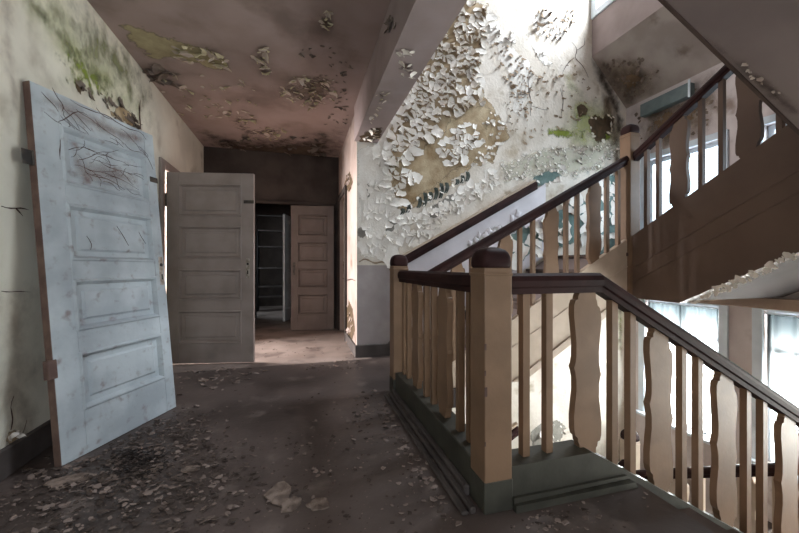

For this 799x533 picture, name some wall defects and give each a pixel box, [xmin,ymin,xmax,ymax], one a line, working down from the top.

leakage [85,29,128,78]
peeling [75,79,142,129]
peeling [119,24,353,157]
peeling [344,0,620,270]
leakage [597,57,659,161]
spalling [690,252,797,304]